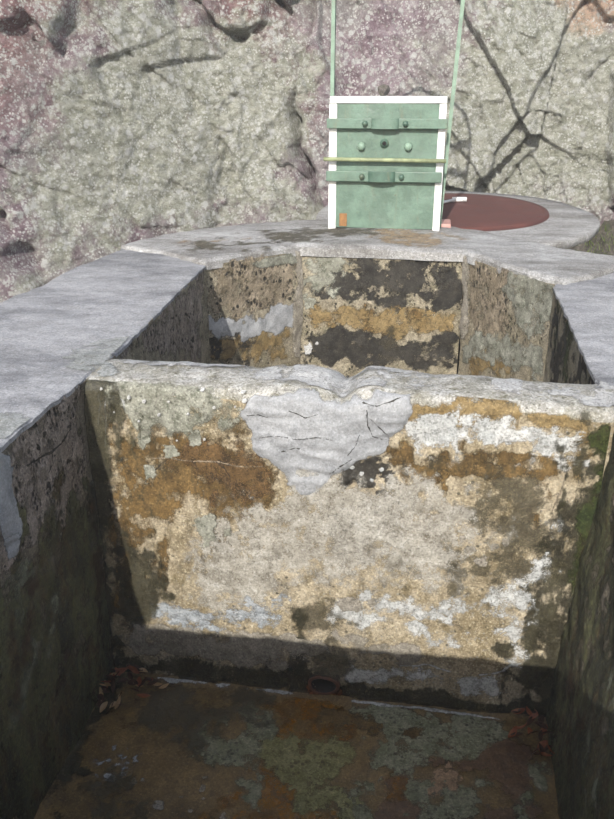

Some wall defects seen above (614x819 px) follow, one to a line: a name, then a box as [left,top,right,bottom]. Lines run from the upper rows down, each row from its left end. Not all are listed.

damp [4,500,36,622]
rust [107,417,279,591]
damp [105,299,614,761]